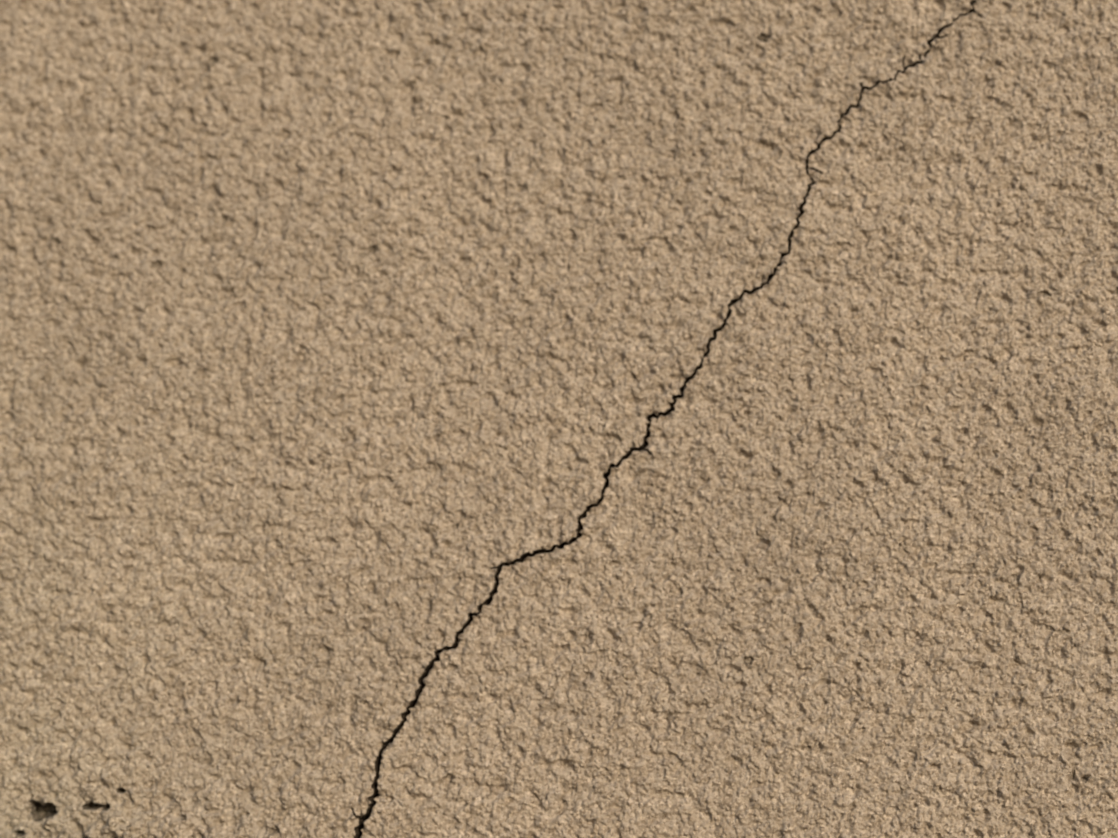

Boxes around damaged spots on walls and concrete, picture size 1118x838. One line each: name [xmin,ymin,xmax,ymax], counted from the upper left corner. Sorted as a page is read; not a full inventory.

crack [351,0,982,838]